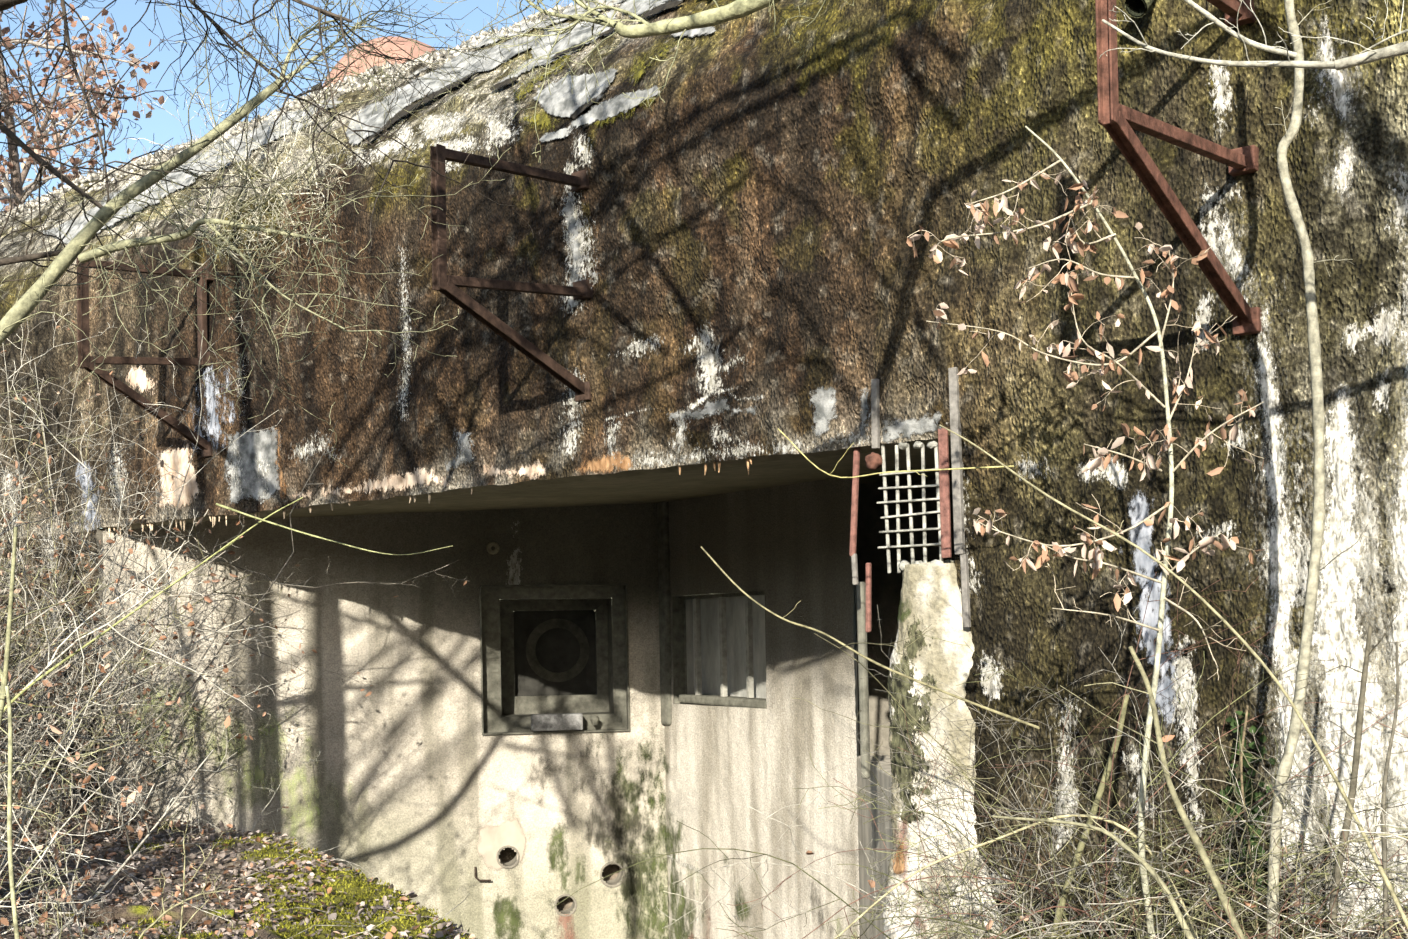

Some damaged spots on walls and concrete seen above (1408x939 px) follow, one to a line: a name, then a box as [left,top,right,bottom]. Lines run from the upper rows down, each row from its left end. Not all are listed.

peeling [43,99,343,244]
peeling [344,0,680,171]
efflorescence [559,133,598,317]
peeling [671,26,715,37]
efflorescence [1209,64,1237,136]
efflorescence [1196,179,1254,302]
efflorescence [558,369,585,458]
efflorescence [685,325,744,398]
damp [604,419,869,470]
efflorescence [1251,163,1408,939]
damp [1129,491,1206,837]
damp [587,744,703,939]